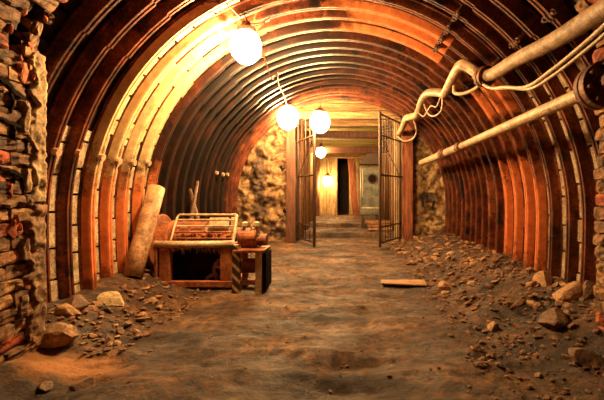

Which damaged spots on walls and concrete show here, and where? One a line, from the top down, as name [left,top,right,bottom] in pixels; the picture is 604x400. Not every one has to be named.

rust [338,0,455,63]
rust [471,81,518,120]
rust [81,167,158,285]
rust [485,175,496,219]
rust [498,148,547,271]